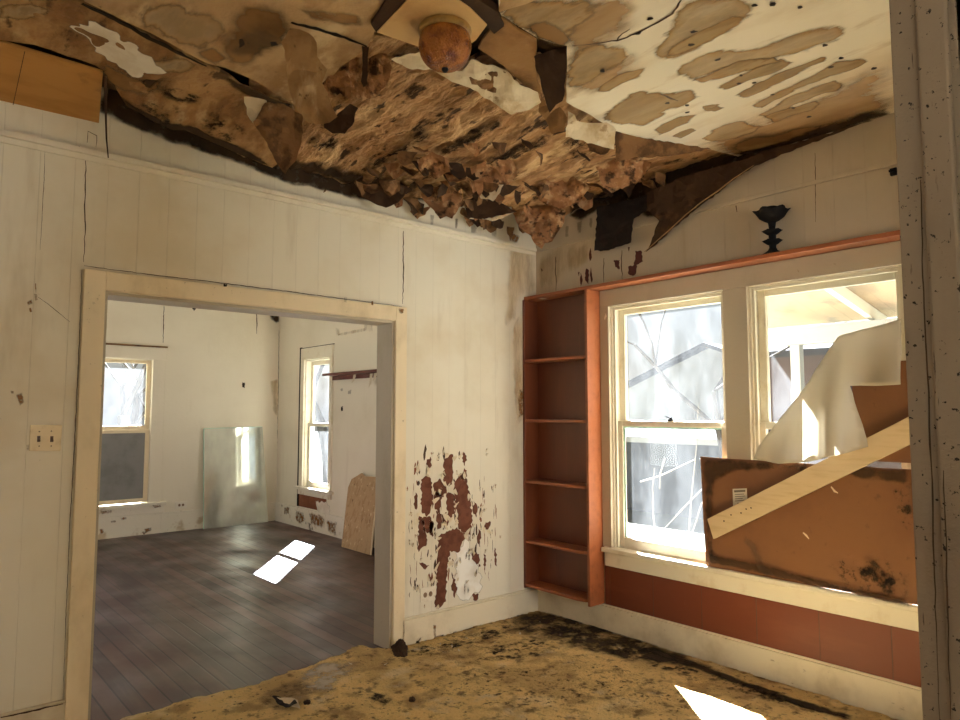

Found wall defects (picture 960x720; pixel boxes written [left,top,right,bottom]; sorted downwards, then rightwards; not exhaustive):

damp [100,5,444,200]
damp [570,0,887,219]
damp [442,121,500,154]
damp [488,137,546,164]
peeling [578,249,593,285]
peeling [614,247,643,276]
crack [1,131,404,718]
peeling [284,501,336,534]
peeling [406,445,501,610]